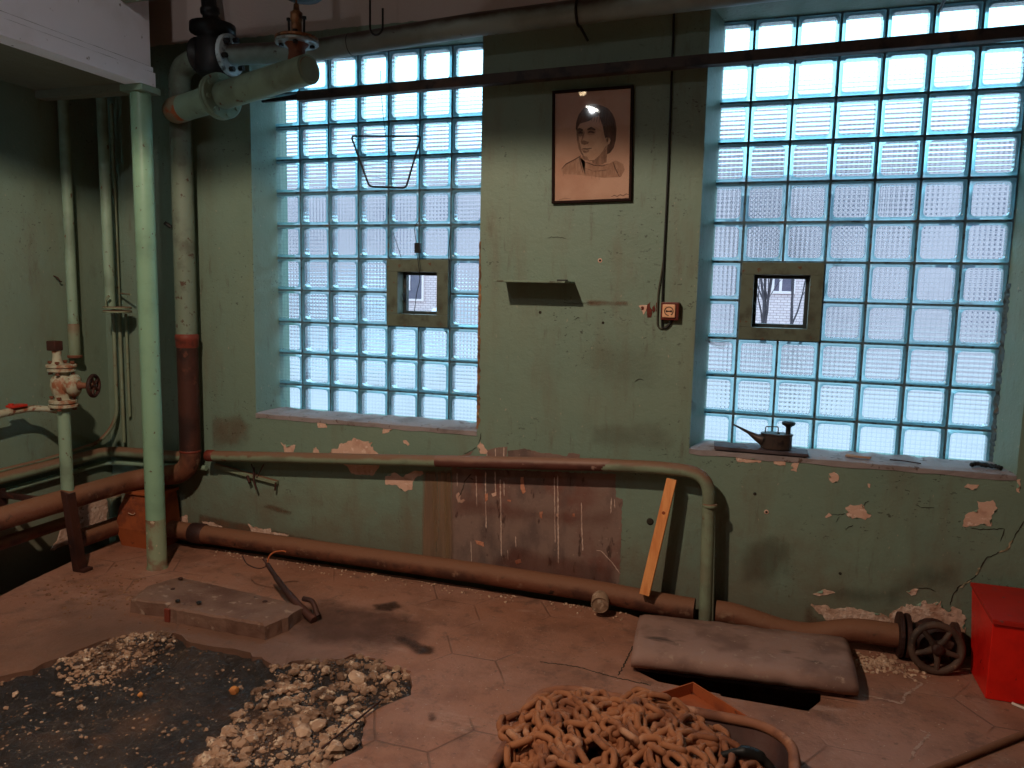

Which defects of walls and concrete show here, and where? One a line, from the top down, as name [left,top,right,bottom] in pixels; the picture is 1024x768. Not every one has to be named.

peeling [313,438,424,491]
peeling [845,504,871,520]
peeling [963,484,997,527]
crack [919,521,1024,605]
spalling [811,589,966,641]